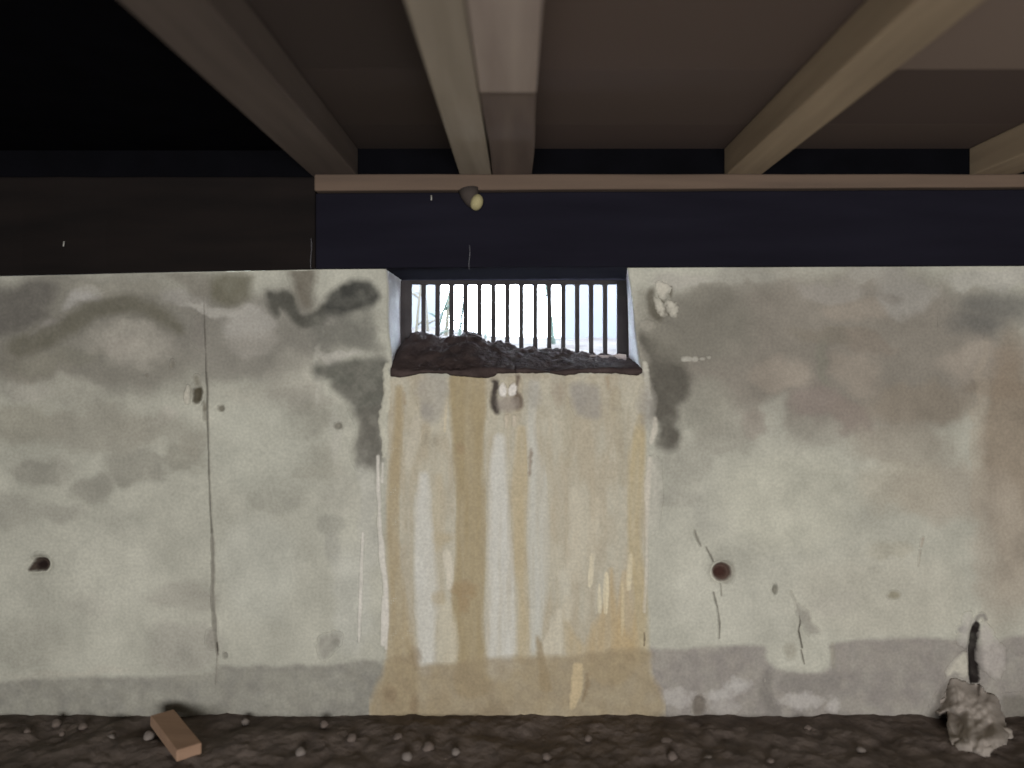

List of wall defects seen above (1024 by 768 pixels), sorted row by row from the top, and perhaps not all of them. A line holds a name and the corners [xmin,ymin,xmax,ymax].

damp [0,270,392,718]
spalling [183,373,227,413]
crack [202,302,220,685]
damp [401,414,459,663]
spalling [487,373,544,429]
corrosion [369,373,666,717]
damp [483,282,712,656]
crack [693,529,723,639]
crack [789,590,822,665]
peeling [944,610,1007,681]